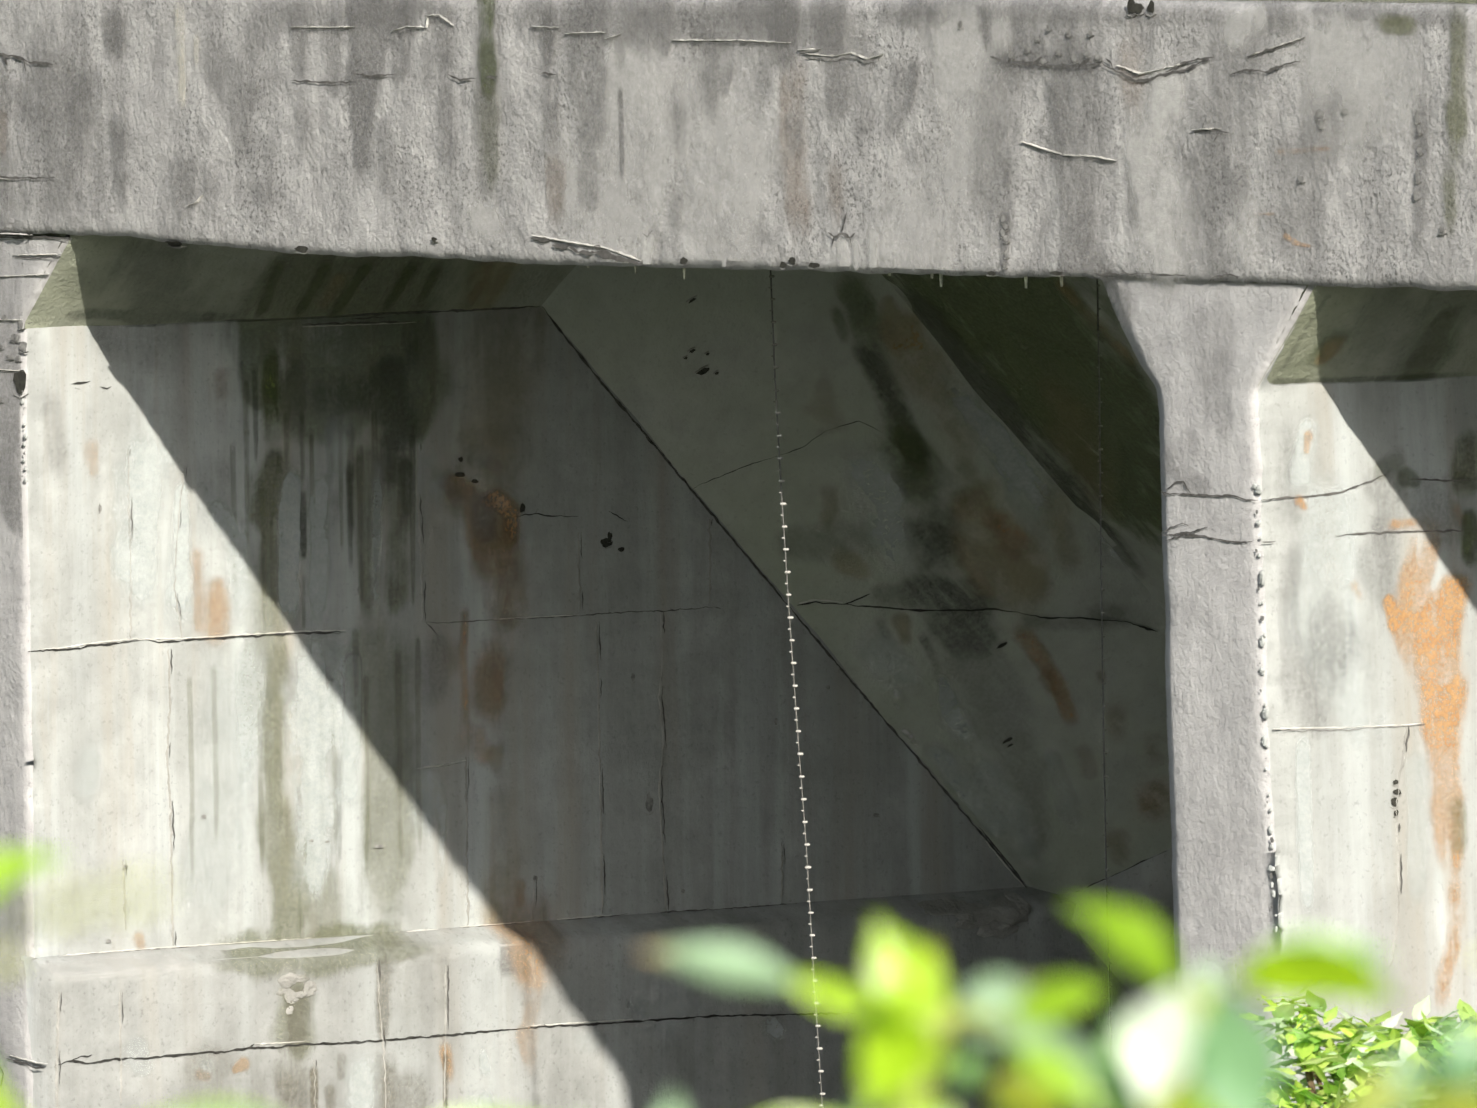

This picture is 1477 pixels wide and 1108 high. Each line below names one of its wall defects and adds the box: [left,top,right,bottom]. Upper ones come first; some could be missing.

spalling [990,25,1103,69]
leakage [839,59,1162,541]
crack [28,630,346,652]
leakage [251,451,306,604]
leakage [342,656,361,798]
crack [227,306,1157,887]
crack [1160,474,1476,543]
rust [1384,559,1466,758]
crack [0,1012,836,1084]